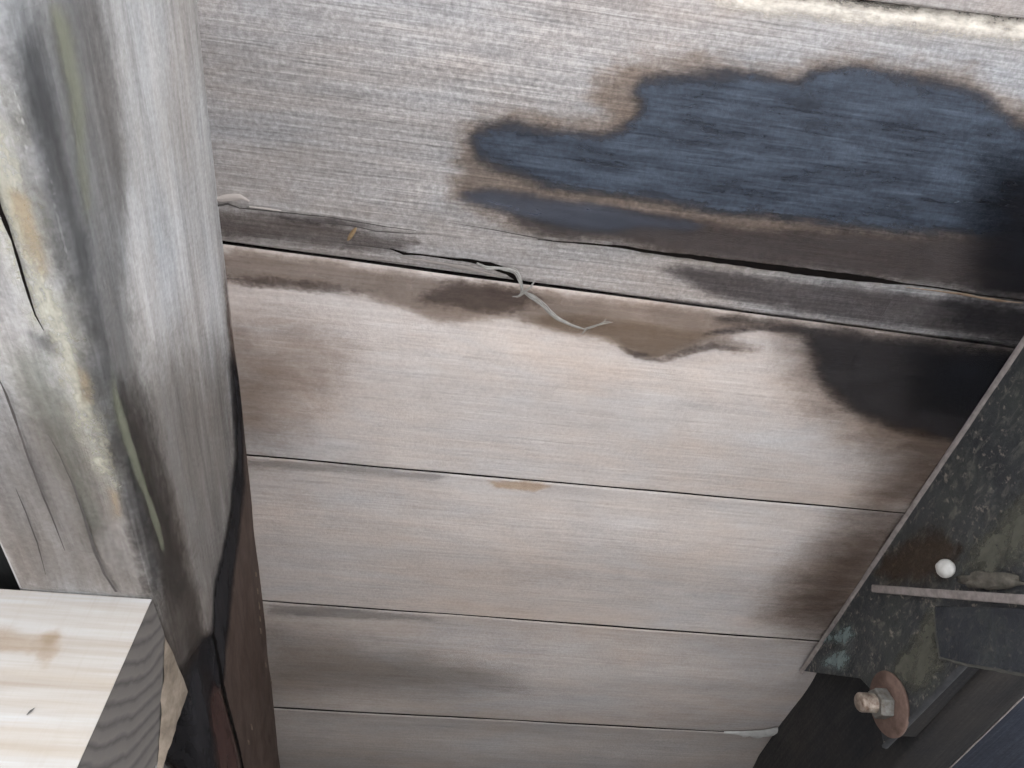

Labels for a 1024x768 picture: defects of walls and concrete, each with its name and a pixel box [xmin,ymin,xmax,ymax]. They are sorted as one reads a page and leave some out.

leakage [471,68,1024,281]
crack [0,203,44,330]
crack [218,203,1024,304]
crack [0,381,65,575]
crack [49,436,117,592]
leakage [164,362,280,768]
leakage [809,331,1011,479]